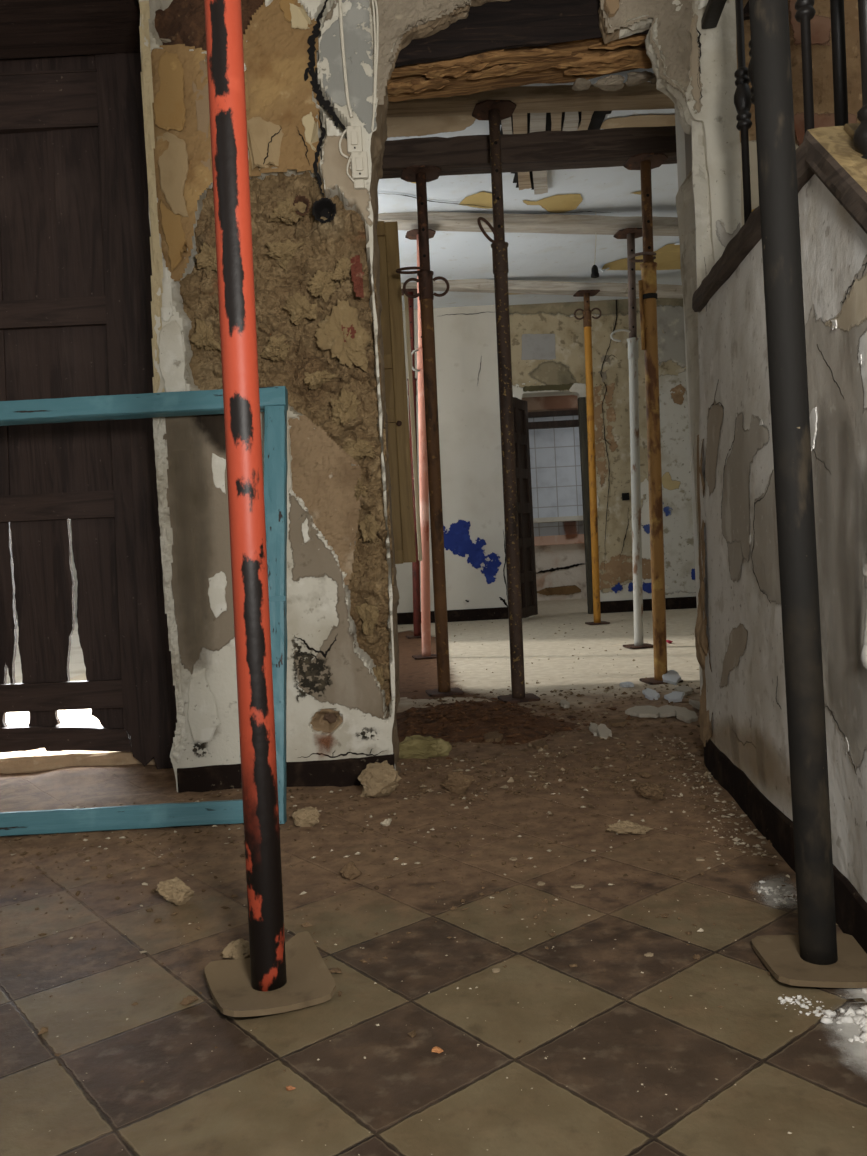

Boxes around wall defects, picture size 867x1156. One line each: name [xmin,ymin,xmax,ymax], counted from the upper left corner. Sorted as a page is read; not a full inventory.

spalling [600,0,708,114]
flaking render [788,0,831,46]
flaking render [139,0,223,393]
peeling [459,192,492,209]
peeling [523,194,583,213]
peeling [153,415,235,763]
spalling [241,0,476,739]
spalling [537,585,581,596]
crack [536,563,583,574]
crack [600,319,629,556]
peeling [598,305,781,747]
peeling [805,255,867,769]